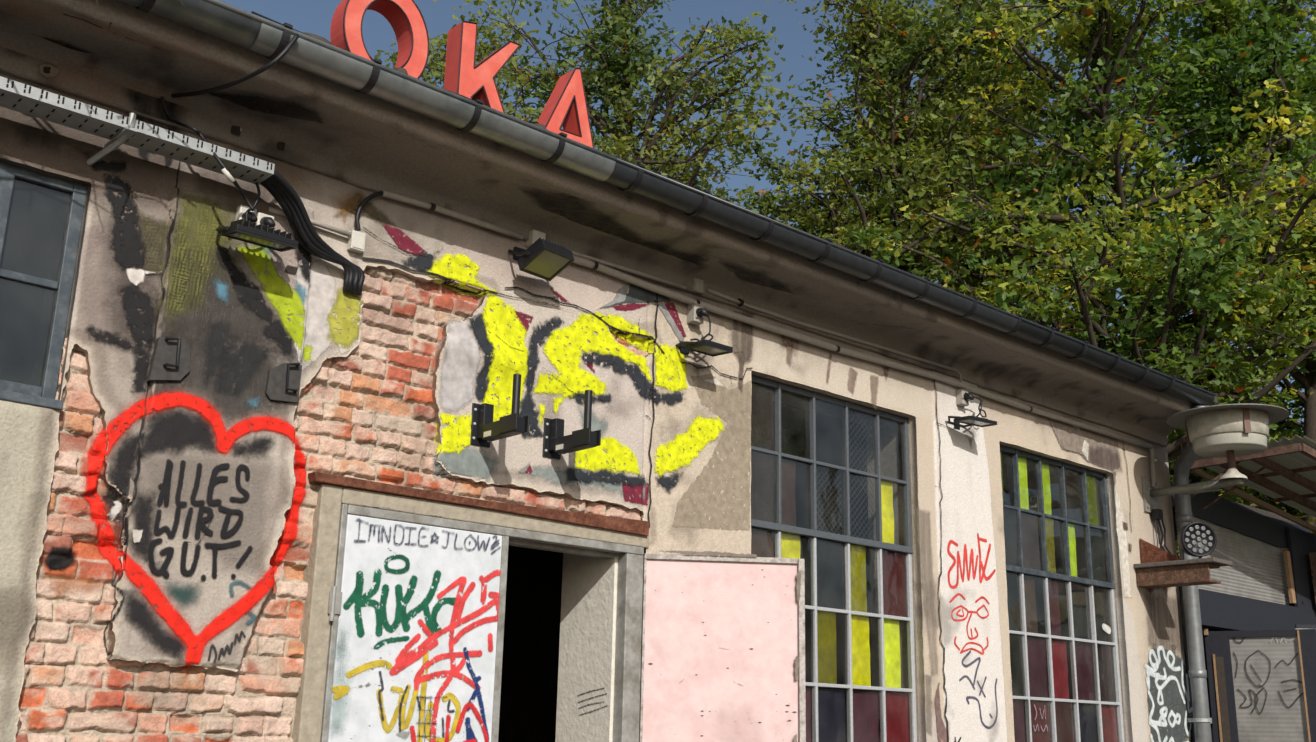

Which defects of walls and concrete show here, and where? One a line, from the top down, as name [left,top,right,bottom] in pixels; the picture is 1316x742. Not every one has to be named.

leakage [524,191,704,265]
leakage [722,263,791,293]
spalling [609,330,653,356]
spalling [16,260,640,742]